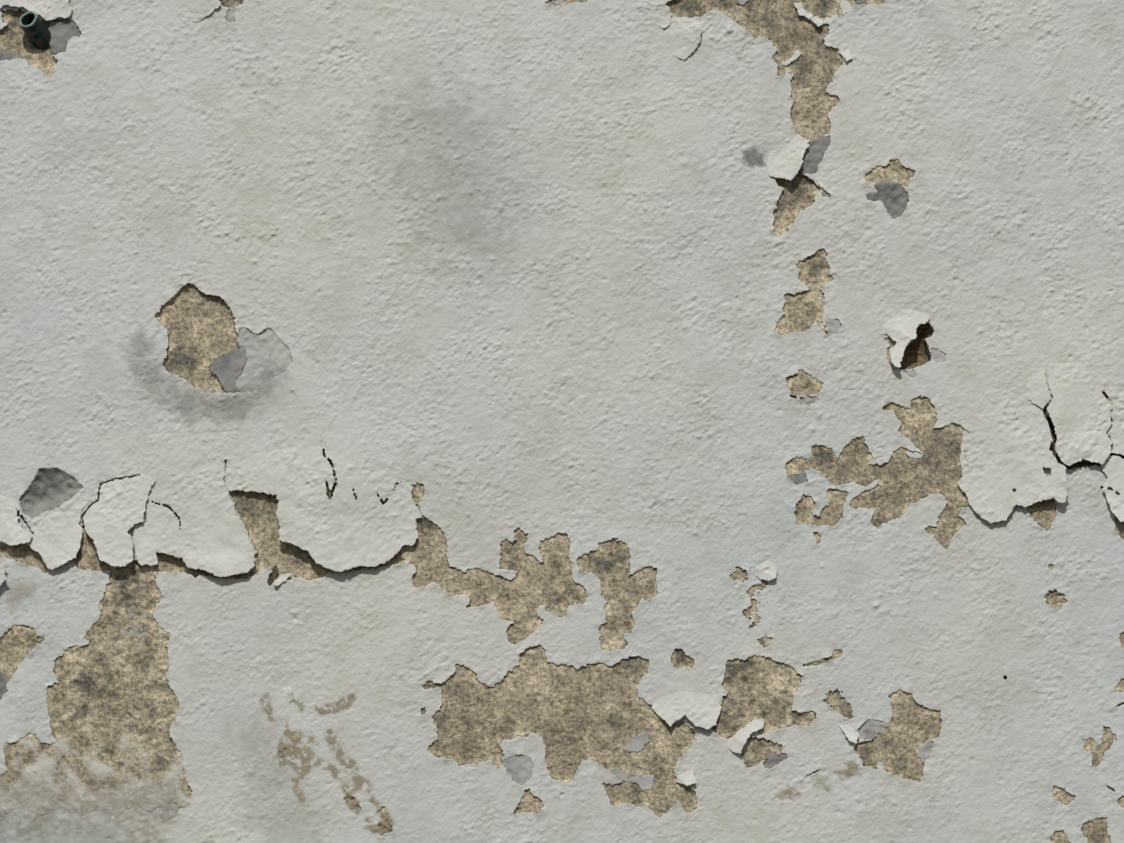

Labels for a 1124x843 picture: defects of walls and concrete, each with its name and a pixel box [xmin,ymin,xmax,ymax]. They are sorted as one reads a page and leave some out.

peeling [0,0,82,77]
peeling [185,0,244,22]
peeling [640,0,884,234]
peeling [865,159,915,219]
peeling [155,284,292,393]
peeling [775,249,841,335]
peeling [786,361,1124,549]
peeling [0,441,816,836]
peeling [823,689,941,782]